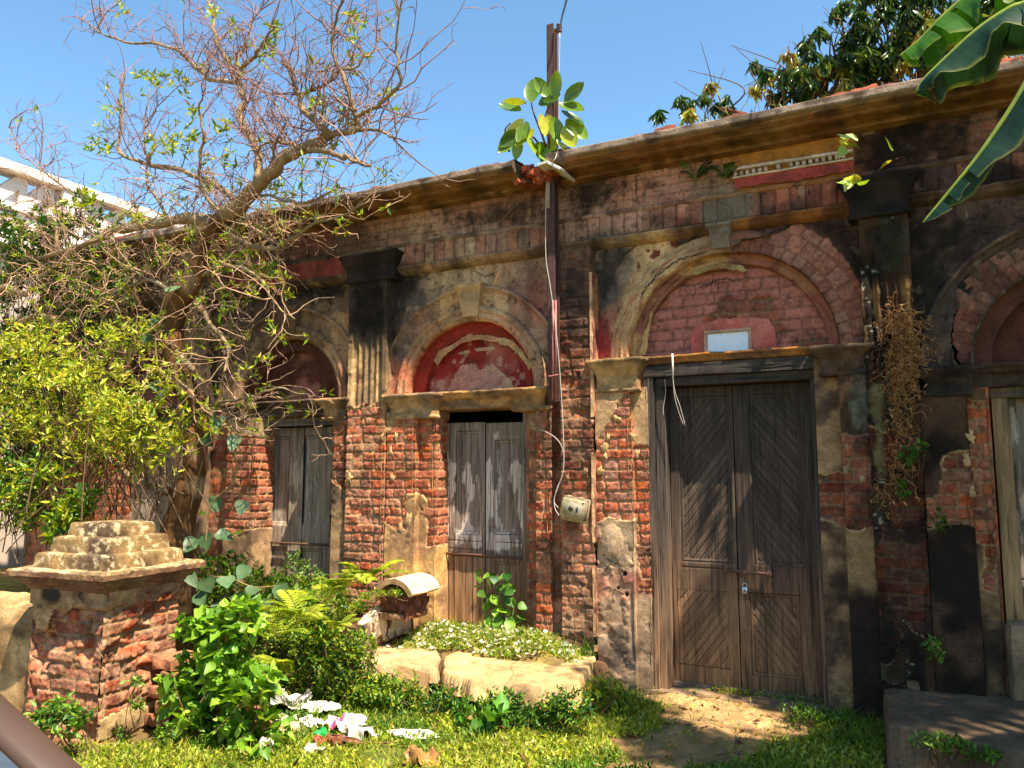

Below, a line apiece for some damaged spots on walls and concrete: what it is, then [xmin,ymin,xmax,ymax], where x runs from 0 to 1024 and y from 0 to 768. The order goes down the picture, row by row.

flaking render [332,402,449,611]
peeling [434,333,531,392]
flaking render [529,245,653,656]
flaking render [638,224,864,357]
flaking render [819,400,996,665]